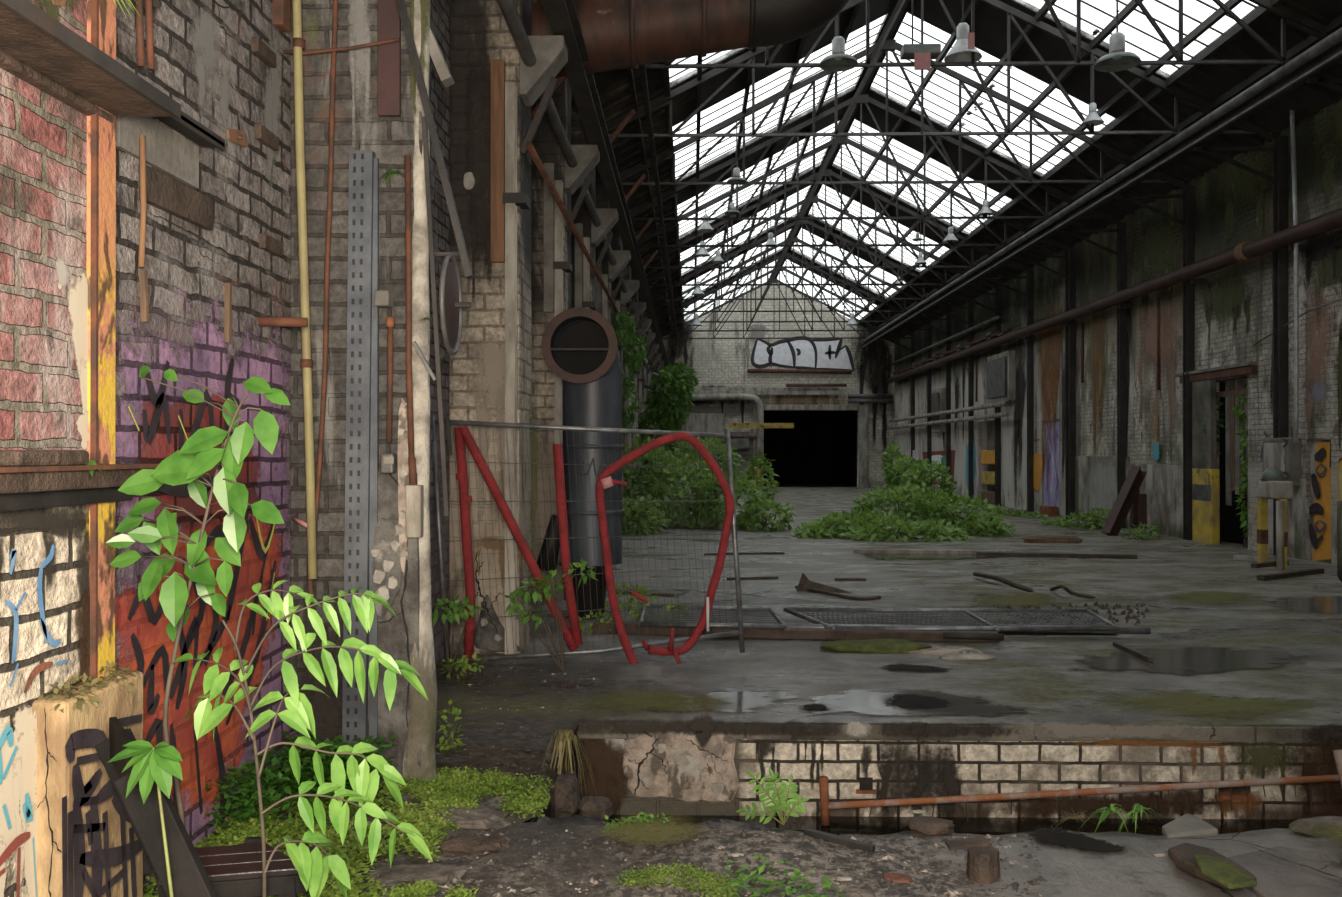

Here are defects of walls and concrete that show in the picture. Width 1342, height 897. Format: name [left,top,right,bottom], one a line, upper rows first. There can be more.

peeling [56,260,89,450]
rust [1039,312,1061,486]
water stain [1299,227,1342,335]
crack [607,719,729,795]